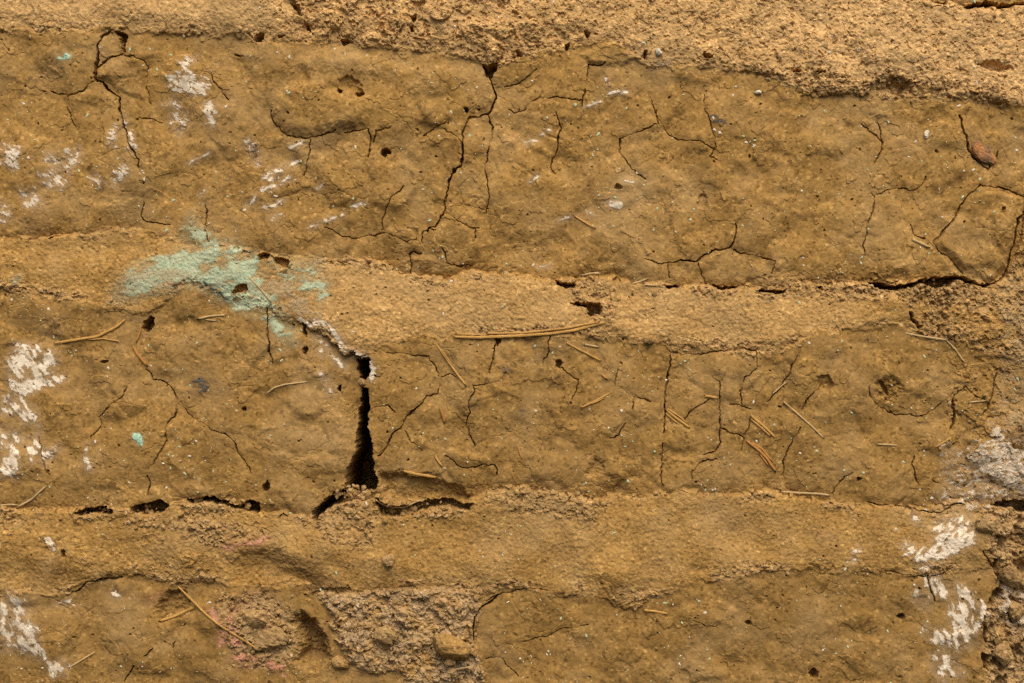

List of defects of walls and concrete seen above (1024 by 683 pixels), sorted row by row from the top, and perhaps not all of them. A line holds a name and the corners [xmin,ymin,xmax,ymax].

crack [50,30,163,168]
crack [140,202,171,226]
crack [211,76,229,100]
crack [270,108,392,177]
crack [323,61,606,277]
crack [618,94,719,180]
crack [644,223,776,285]
crack [860,116,884,164]
crack [862,176,927,256]
crack [910,114,1024,285]
crack [90,369,252,496]
crack [370,344,499,476]